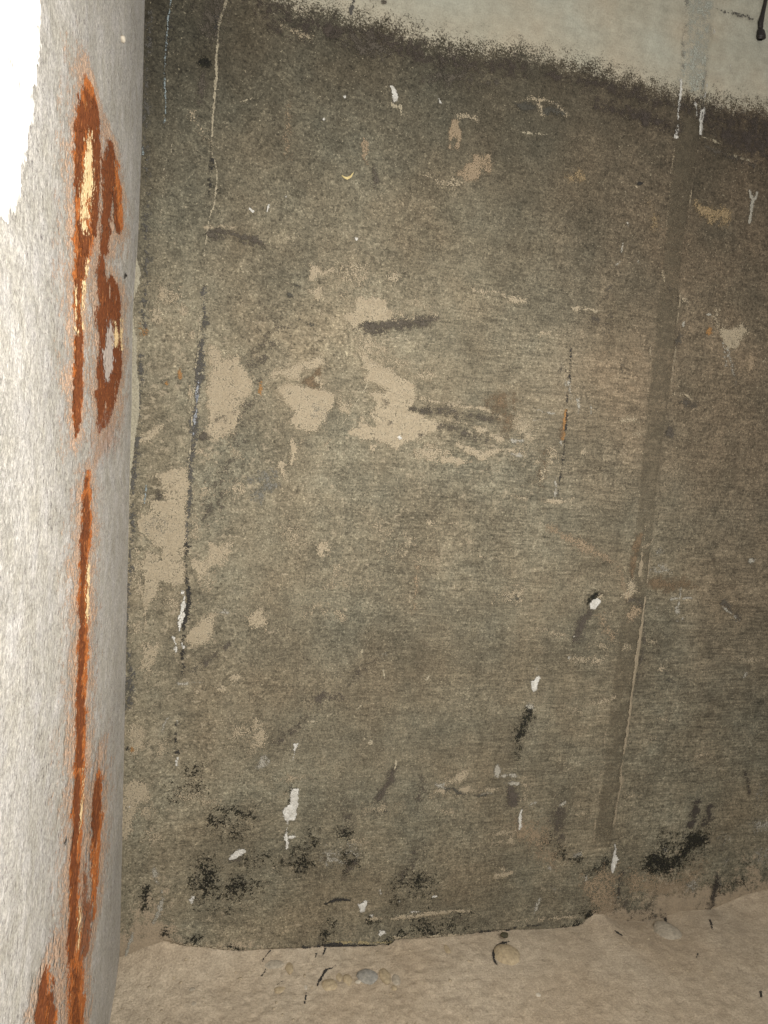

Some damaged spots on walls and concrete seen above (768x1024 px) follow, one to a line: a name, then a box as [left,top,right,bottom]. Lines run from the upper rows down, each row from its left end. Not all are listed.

water stain [253,0,768,174]
peeling [146,279,191,326]
crack [125,0,228,710]
peeling [187,255,562,483]
corrosion [23,31,149,1024]
peeling [127,462,253,679]
peeling [124,721,171,762]
crack [173,720,181,766]
water stain [138,868,164,924]
water stain [165,761,373,915]
water stain [640,795,730,892]